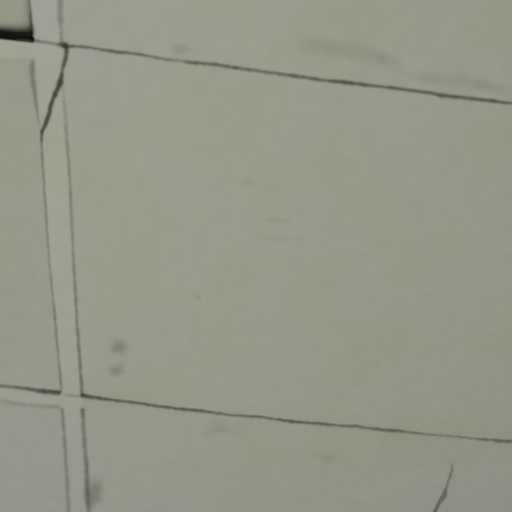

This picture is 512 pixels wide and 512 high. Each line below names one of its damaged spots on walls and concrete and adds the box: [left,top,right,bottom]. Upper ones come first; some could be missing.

crack [41,43,74,138]
crack [313,78,369,86]
crack [388,86,506,103]